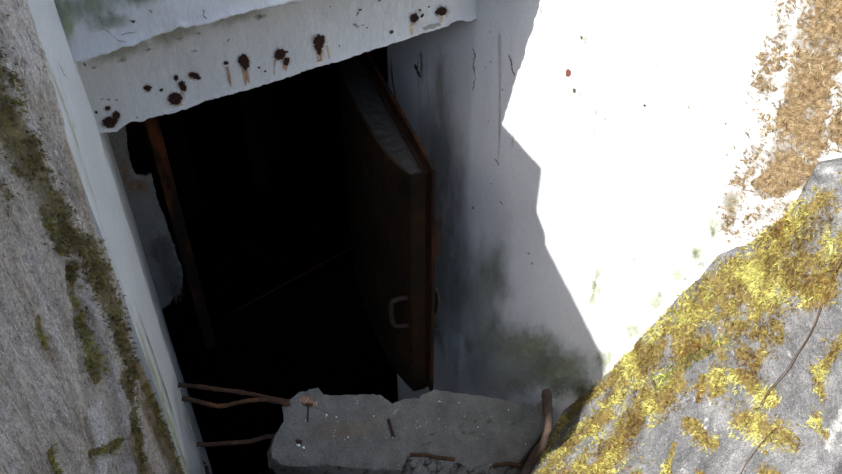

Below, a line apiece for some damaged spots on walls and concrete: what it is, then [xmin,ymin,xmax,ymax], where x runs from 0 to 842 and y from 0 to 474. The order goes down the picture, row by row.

corrosion [410,6,447,34]
corrosion [223,49,290,84]
corrosion [313,34,330,62]
corrosion [144,72,201,106]
water stain [431,117,451,200]
water stain [435,232,500,341]
spalling [178,382,290,419]
spalling [197,428,542,474]